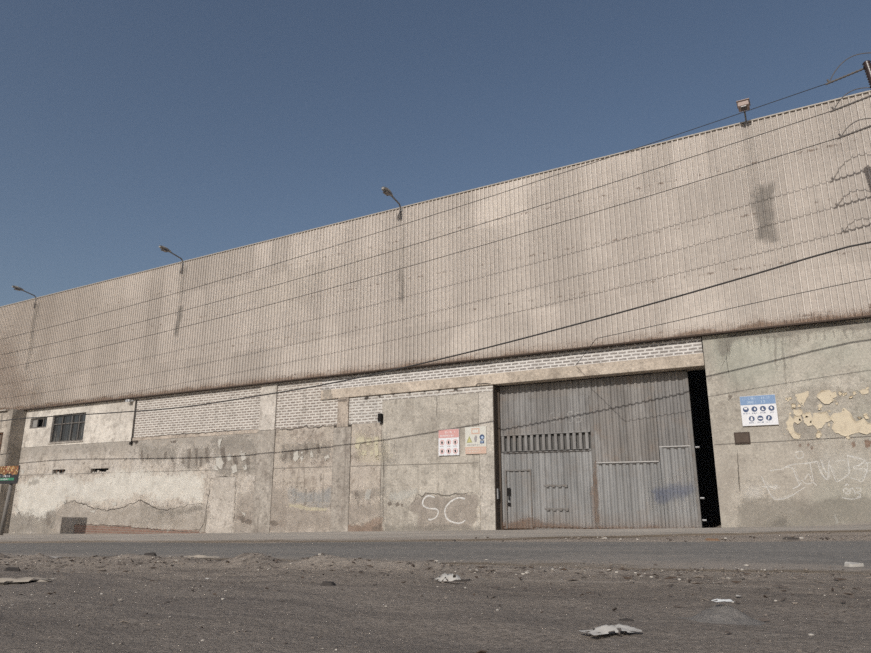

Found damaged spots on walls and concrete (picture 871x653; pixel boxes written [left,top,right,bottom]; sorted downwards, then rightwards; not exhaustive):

water stain [753,185,776,241]
water stain [717,322,871,356]
peeling [784,387,871,439]
peeling [13,428,258,534]